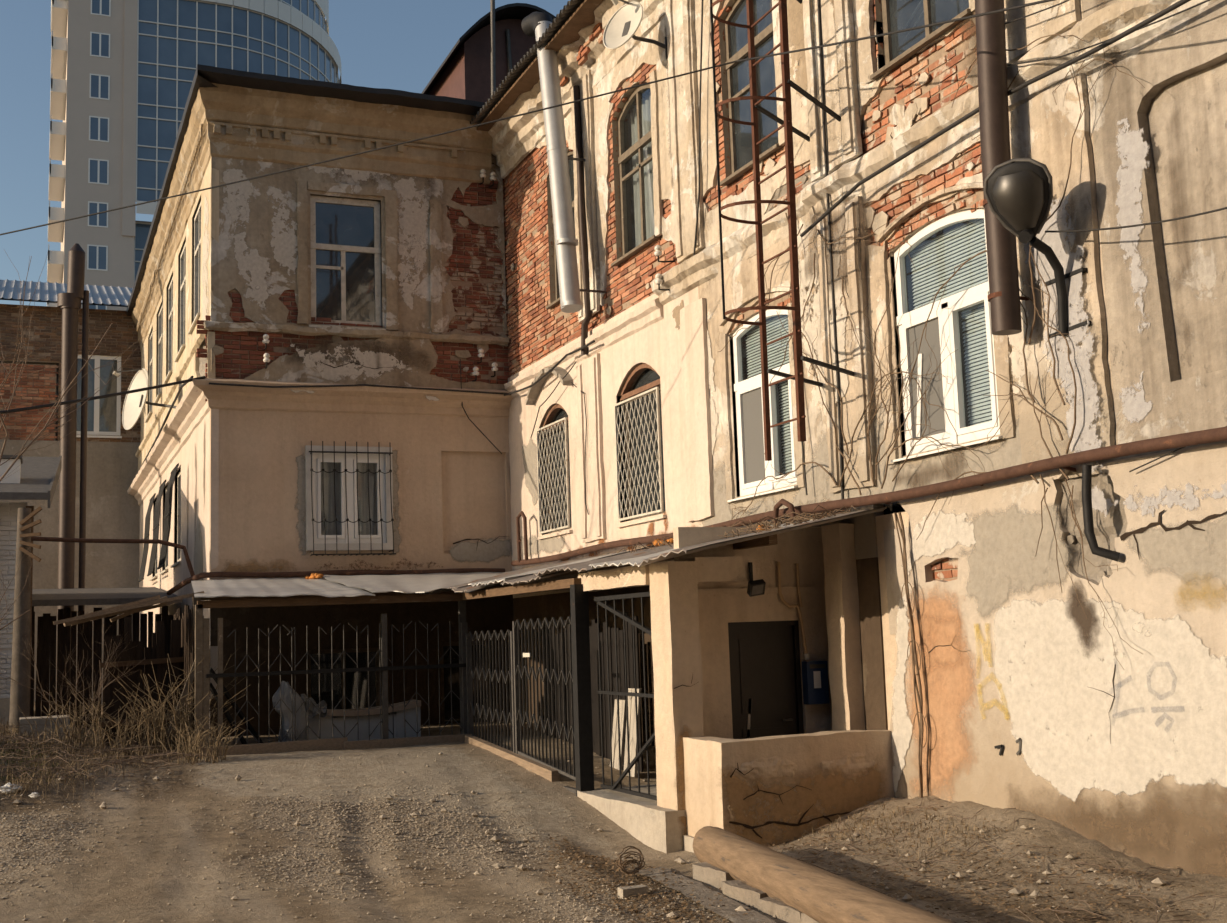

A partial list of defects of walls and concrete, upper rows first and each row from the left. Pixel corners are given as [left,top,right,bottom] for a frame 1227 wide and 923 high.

flaking render [196,60,681,384]
flaking render [787,0,815,107]
flaking render [765,19,978,214]
flaking render [863,142,984,258]
peeling [1115,118,1150,333]
peeling [1007,194,1227,583]
peeling [891,593,913,793]
peeling [907,510,976,581]
leakage [1069,587,1097,648]
peeling [994,598,1227,802]
crack [1120,509,1227,560]
crack [729,763,850,838]